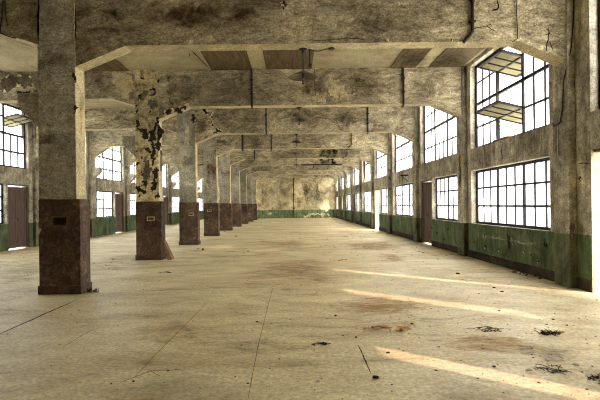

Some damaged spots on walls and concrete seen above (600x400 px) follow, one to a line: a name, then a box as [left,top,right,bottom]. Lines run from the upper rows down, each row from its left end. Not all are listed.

flaking render [0,73,38,94]
spalling [202,109,221,135]
flaking render [111,72,196,199]
flaking render [303,199,330,218]